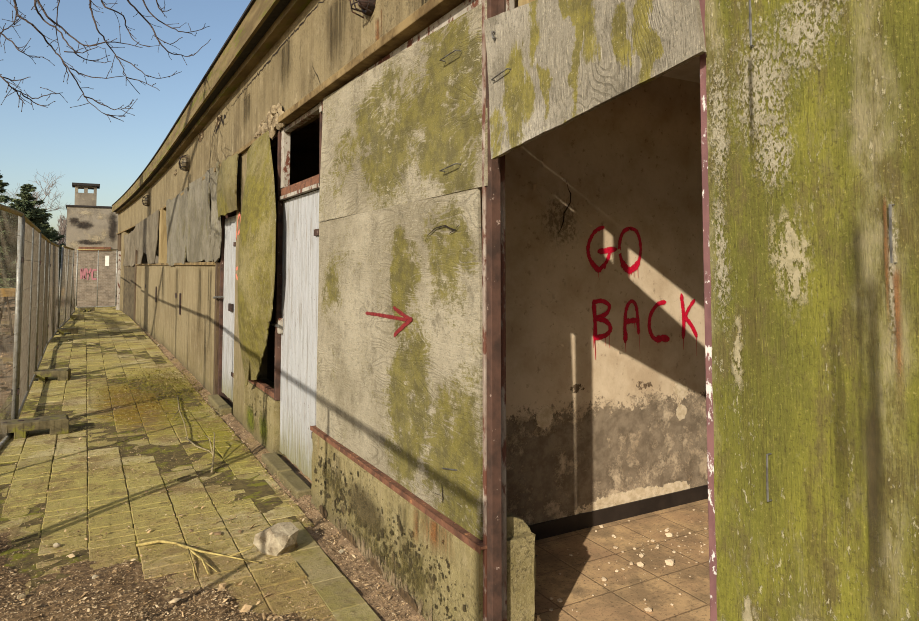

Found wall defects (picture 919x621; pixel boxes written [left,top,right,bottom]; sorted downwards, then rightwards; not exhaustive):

peeling [709,0,845,185]
crack [558,181,571,233]
peeling [715,202,742,383]
peeling [772,215,809,302]
water stain [857,282,880,588]
flaking render [314,447,466,621]
peeling [743,597,759,621]